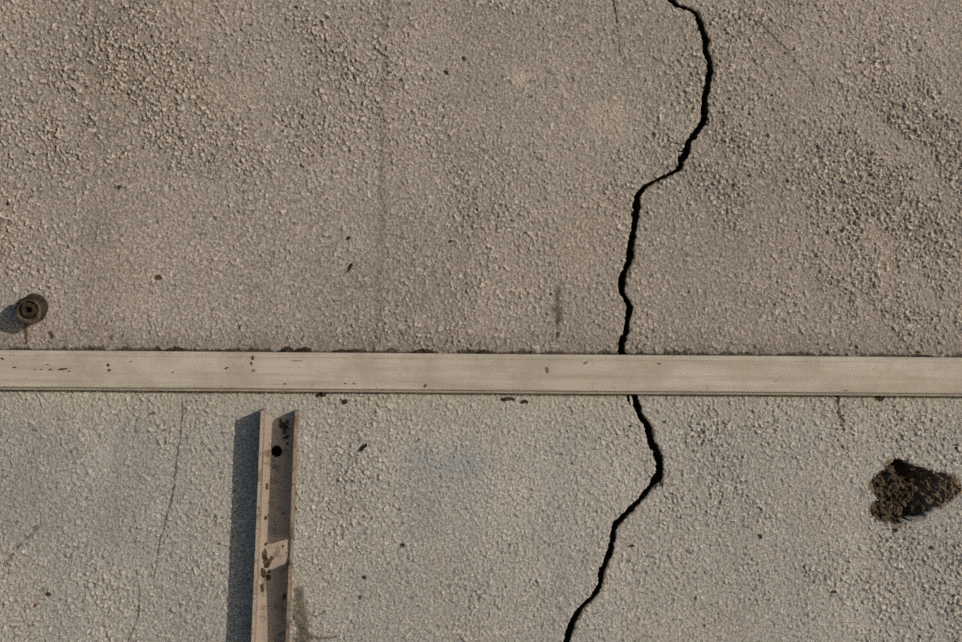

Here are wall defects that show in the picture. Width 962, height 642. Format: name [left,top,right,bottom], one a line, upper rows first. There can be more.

crack [612,0,626,64]
crack [618,0,715,355]
crack [563,394,665,642]
spalling [868,457,962,533]